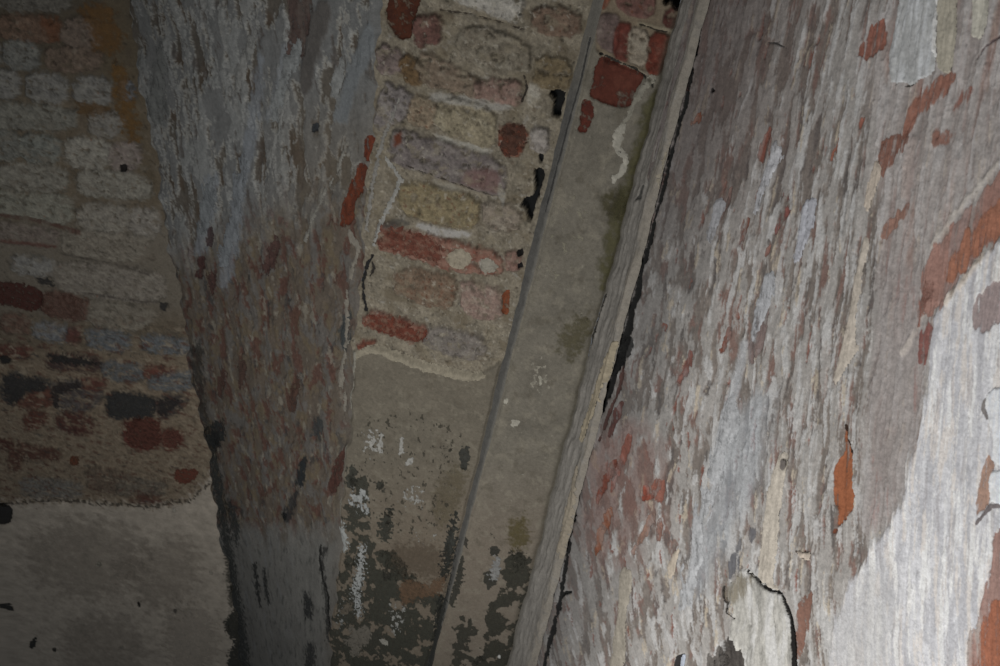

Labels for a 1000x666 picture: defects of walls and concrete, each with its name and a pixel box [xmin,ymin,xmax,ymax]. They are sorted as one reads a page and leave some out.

flaking render [386,0,421,40]
water stain [611,74,656,184]
crack [362,254,375,311]
spalling [338,97,499,412]
crack [598,36,700,442]
spalling [918,170,1000,365]
flaking render [833,424,855,534]
water stain [301,592,313,620]
water stain [304,413,532,666]
crack [543,512,577,666]
crack [722,587,735,619]
crack [747,570,797,666]